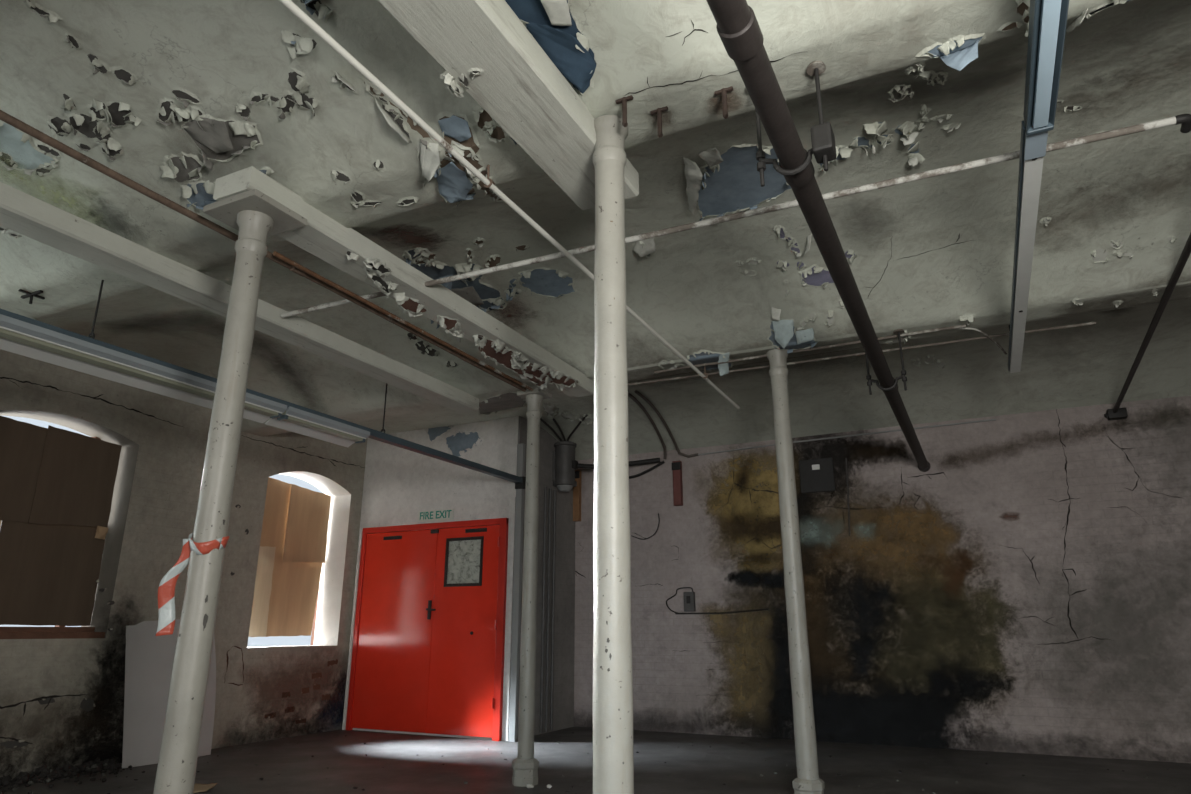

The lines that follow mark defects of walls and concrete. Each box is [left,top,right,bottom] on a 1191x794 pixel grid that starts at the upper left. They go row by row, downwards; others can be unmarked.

peeling [0,28,321,210]
peeling [505,0,599,97]
crack [0,377,185,428]
peeling [345,249,594,425]
peeling [401,237,577,312]
water stain [633,455,795,740]
water stain [853,443,907,462]
water stain [793,451,1030,752]
crack [1000,409,1113,645]
crack [1104,425,1180,523]
crack [0,693,91,744]
water stain [0,604,130,778]